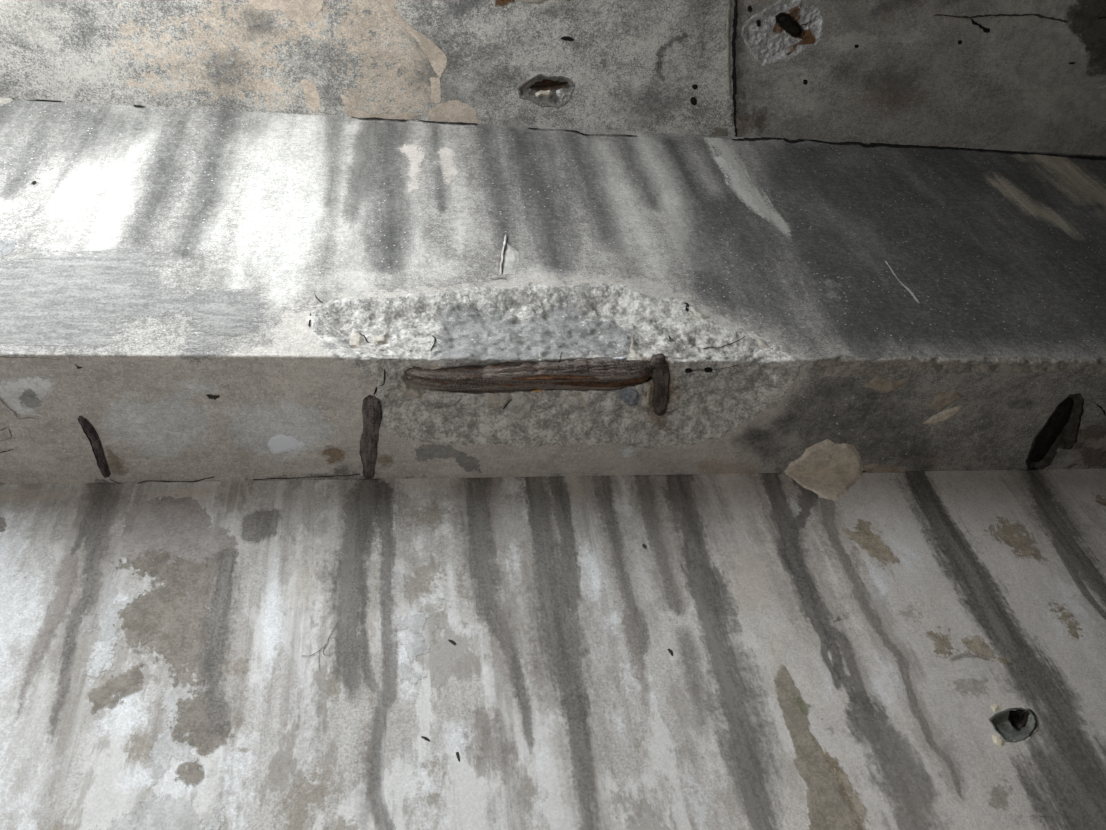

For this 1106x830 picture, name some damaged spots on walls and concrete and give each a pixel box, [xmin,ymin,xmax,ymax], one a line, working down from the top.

peeling [248,0,323,23]
peeling [340,0,479,123]
hole [741,0,824,66]
crack [934,14,1068,33]
crack [0,398,38,420]
crack [0,354,59,362]
damp [0,240,268,362]
spalling [307,243,1106,449]
damp [24,482,279,830]
damp [331,479,431,830]
damp [761,473,960,830]
damp [903,469,1106,830]